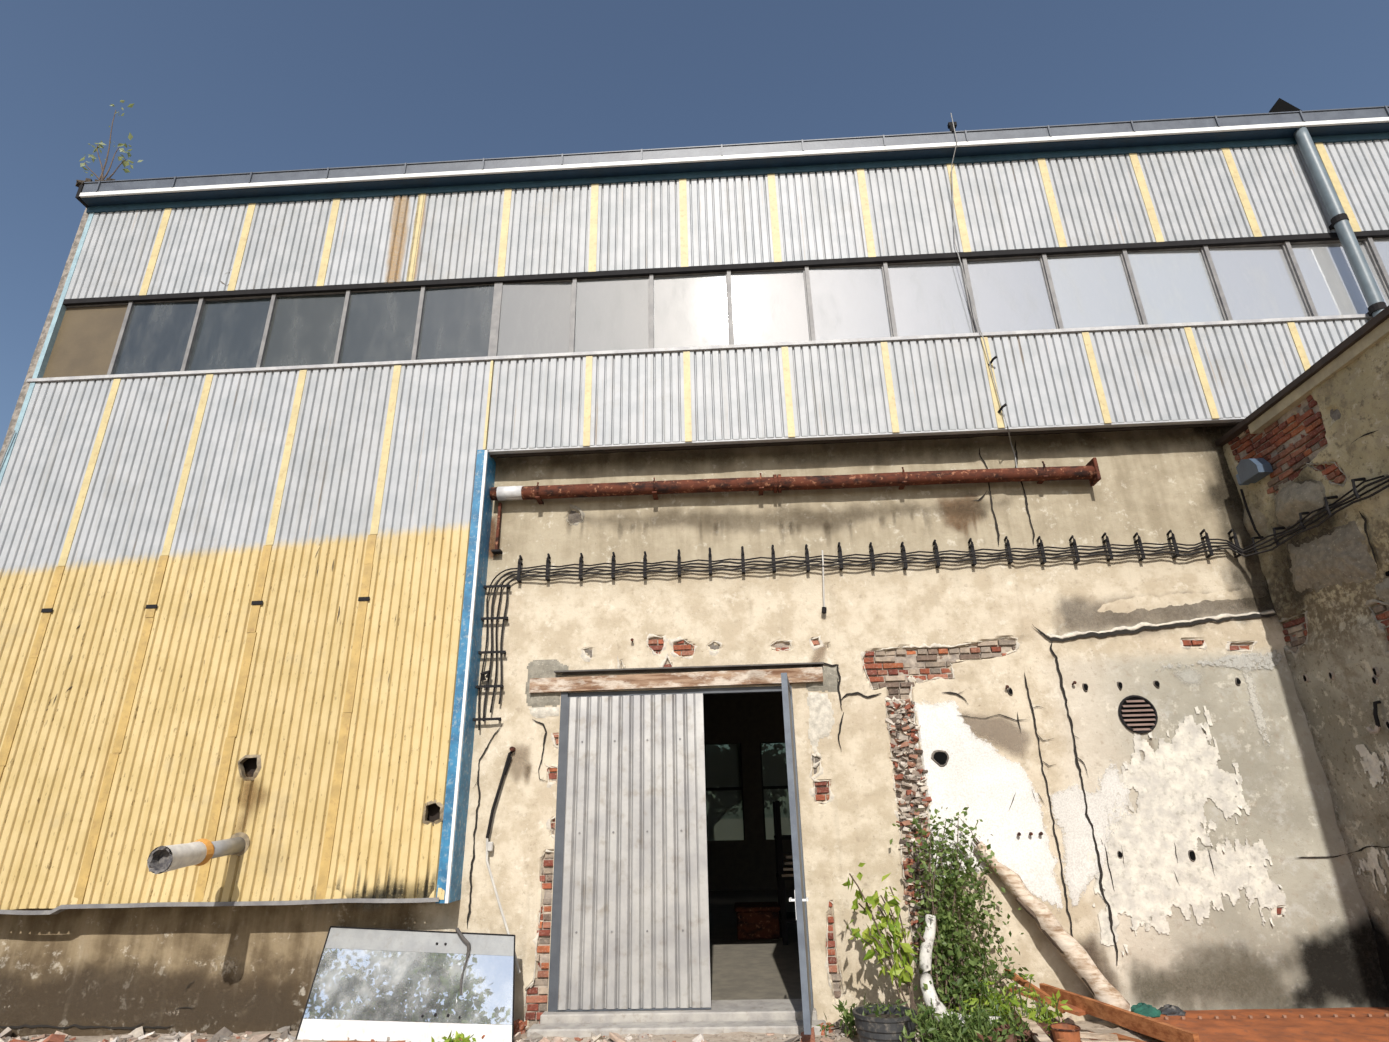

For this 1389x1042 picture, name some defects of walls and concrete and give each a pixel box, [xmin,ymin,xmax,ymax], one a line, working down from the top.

spalling [1228,395,1347,495]
spalling [646,634,723,673]
spalling [860,637,1020,705]
spalling [1365,599,1389,677]
crack [942,609,1277,962]
peeling [1355,720,1389,787]
peeling [1081,706,1286,956]
peeling [1357,845,1389,893]
spalling [514,816,555,1035]
damp [1083,940,1116,989]
damp [1133,917,1389,1009]